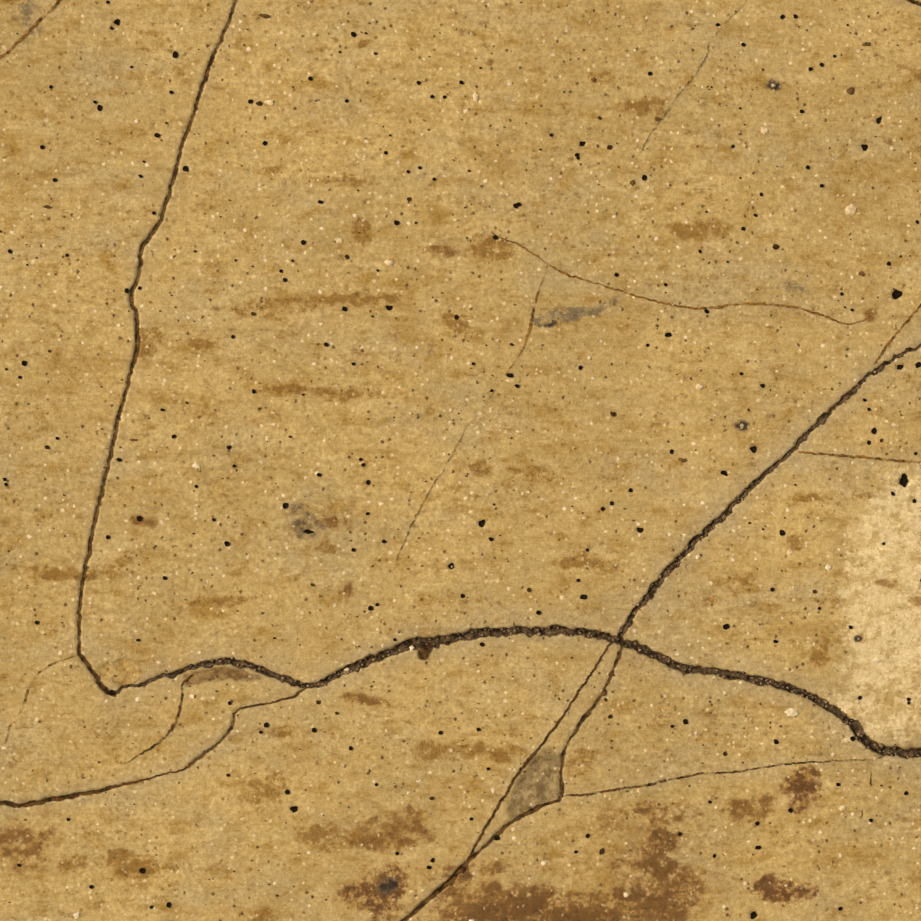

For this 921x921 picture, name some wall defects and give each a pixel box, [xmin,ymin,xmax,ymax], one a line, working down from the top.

crack [0,0,60,58]
crack [77,0,236,697]
crack [0,303,921,921]
crack [491,231,868,369]